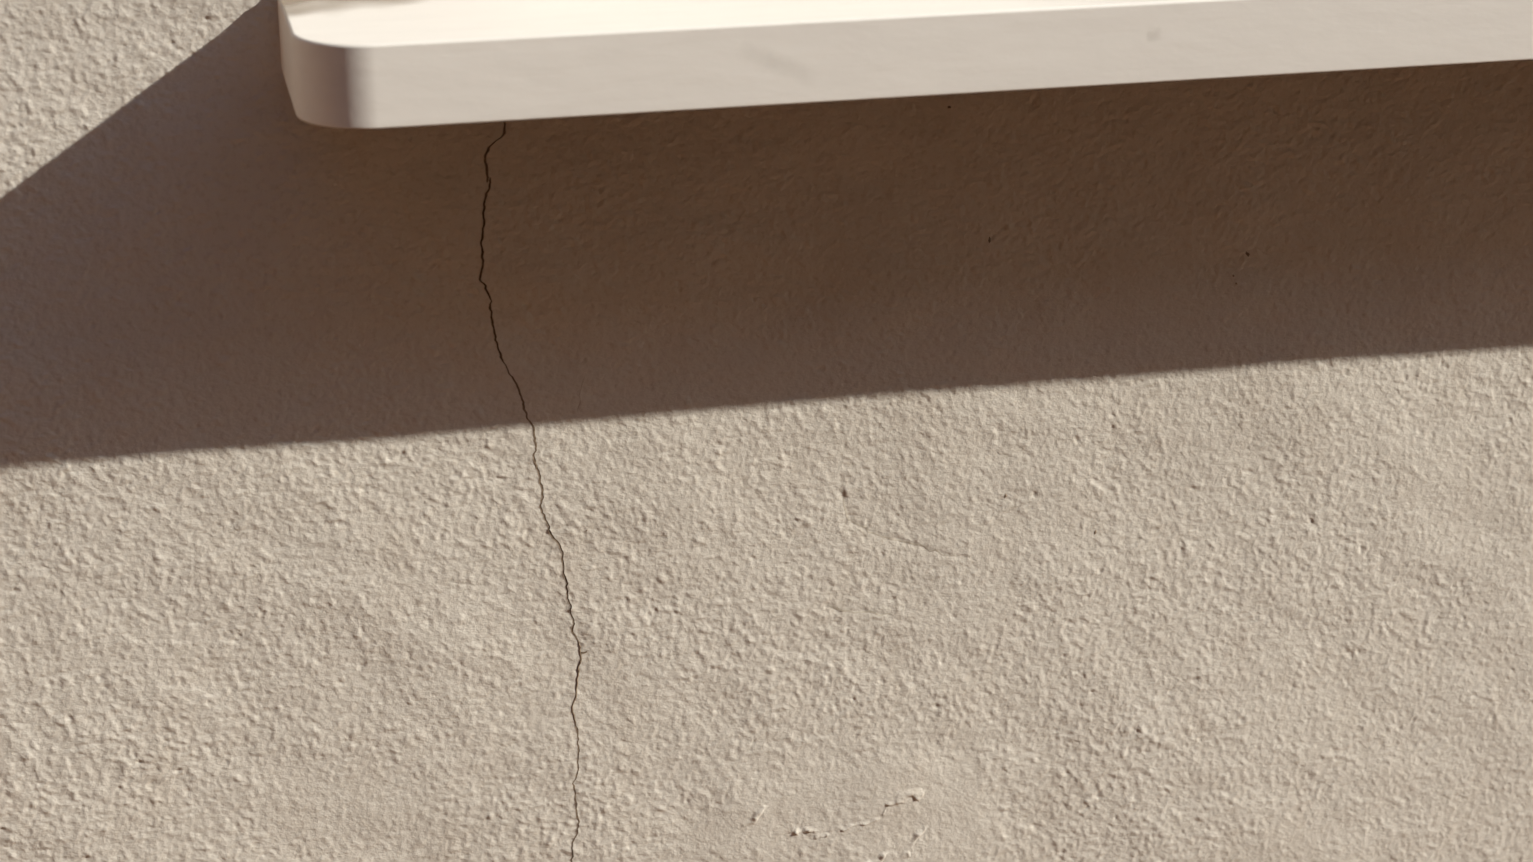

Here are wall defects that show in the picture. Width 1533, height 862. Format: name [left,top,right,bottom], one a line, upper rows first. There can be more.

crack [479,122,587,862]